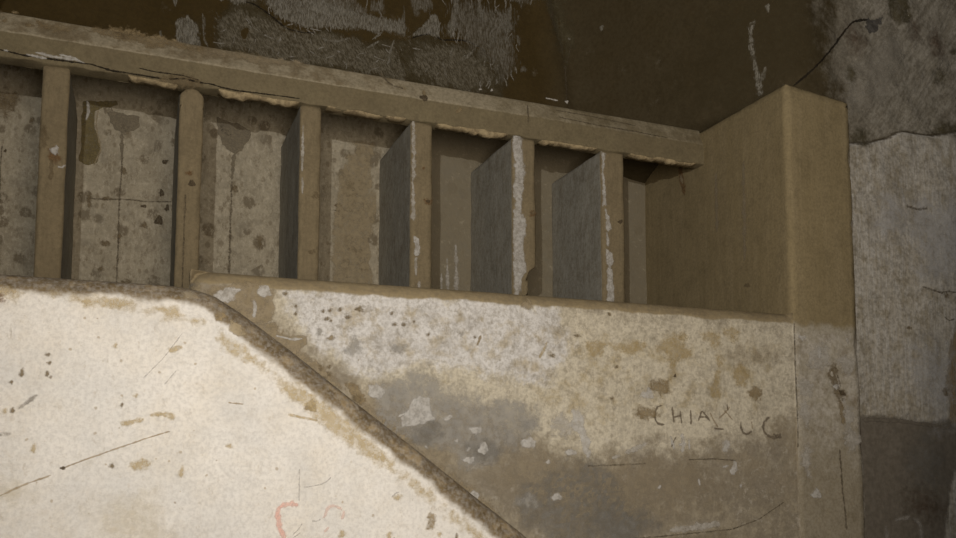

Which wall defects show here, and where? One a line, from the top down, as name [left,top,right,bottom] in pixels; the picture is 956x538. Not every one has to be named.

crack [0,49,300,99]
spalling [175,15,201,46]
spalling [214,0,503,96]
crack [793,16,883,86]